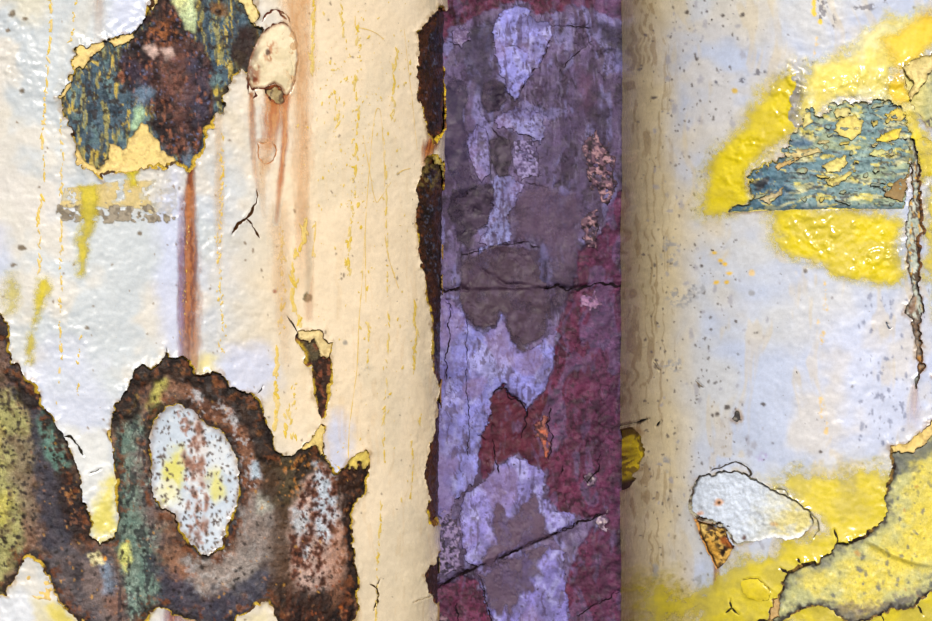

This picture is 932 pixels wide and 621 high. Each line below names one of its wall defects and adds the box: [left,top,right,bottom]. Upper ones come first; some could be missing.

peeling [58,0,264,180]
corrosion [265,0,307,190]
corrosion [424,137,437,159]
peeling [728,53,932,213]
peeling [0,313,370,621]
crack [443,286,499,472]
peeling [415,5,576,621]
crack [415,514,602,621]
crack [546,282,621,292]
peeling [688,470,814,569]
peeling [767,420,932,621]